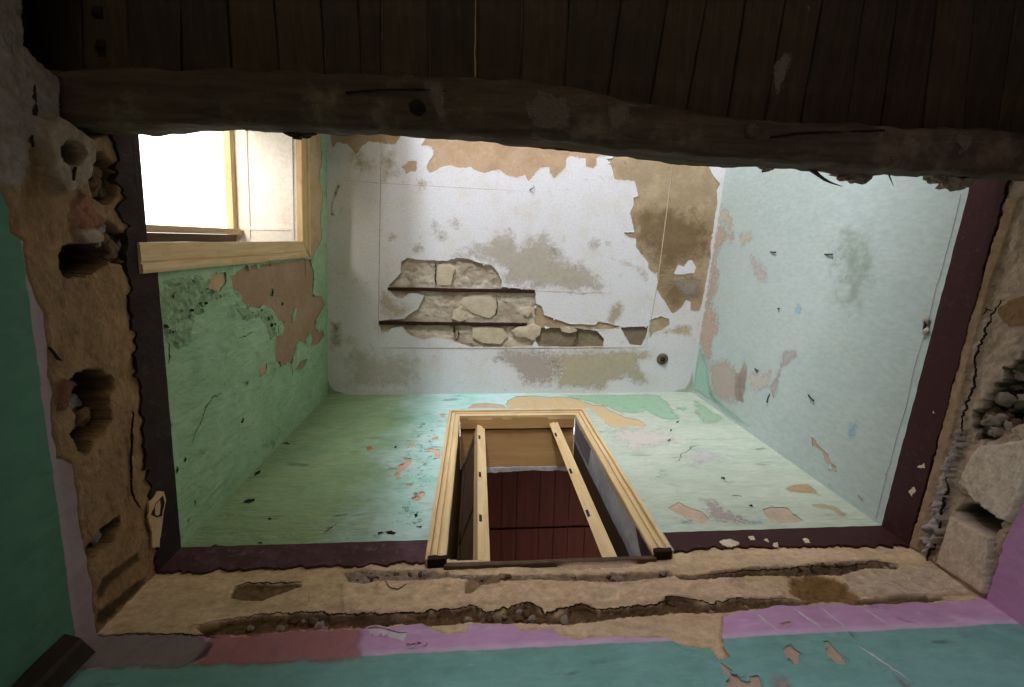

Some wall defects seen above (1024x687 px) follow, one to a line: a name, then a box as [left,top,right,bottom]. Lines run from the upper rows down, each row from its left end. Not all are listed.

crack [770,129,885,138]
flaking render [0,0,166,633]
peeling [205,134,401,388]
crack [100,560,897,638]
peeling [377,138,721,348]
flaking render [97,181,1024,687]
crack [926,477,950,561]
crack [960,300,1002,436]